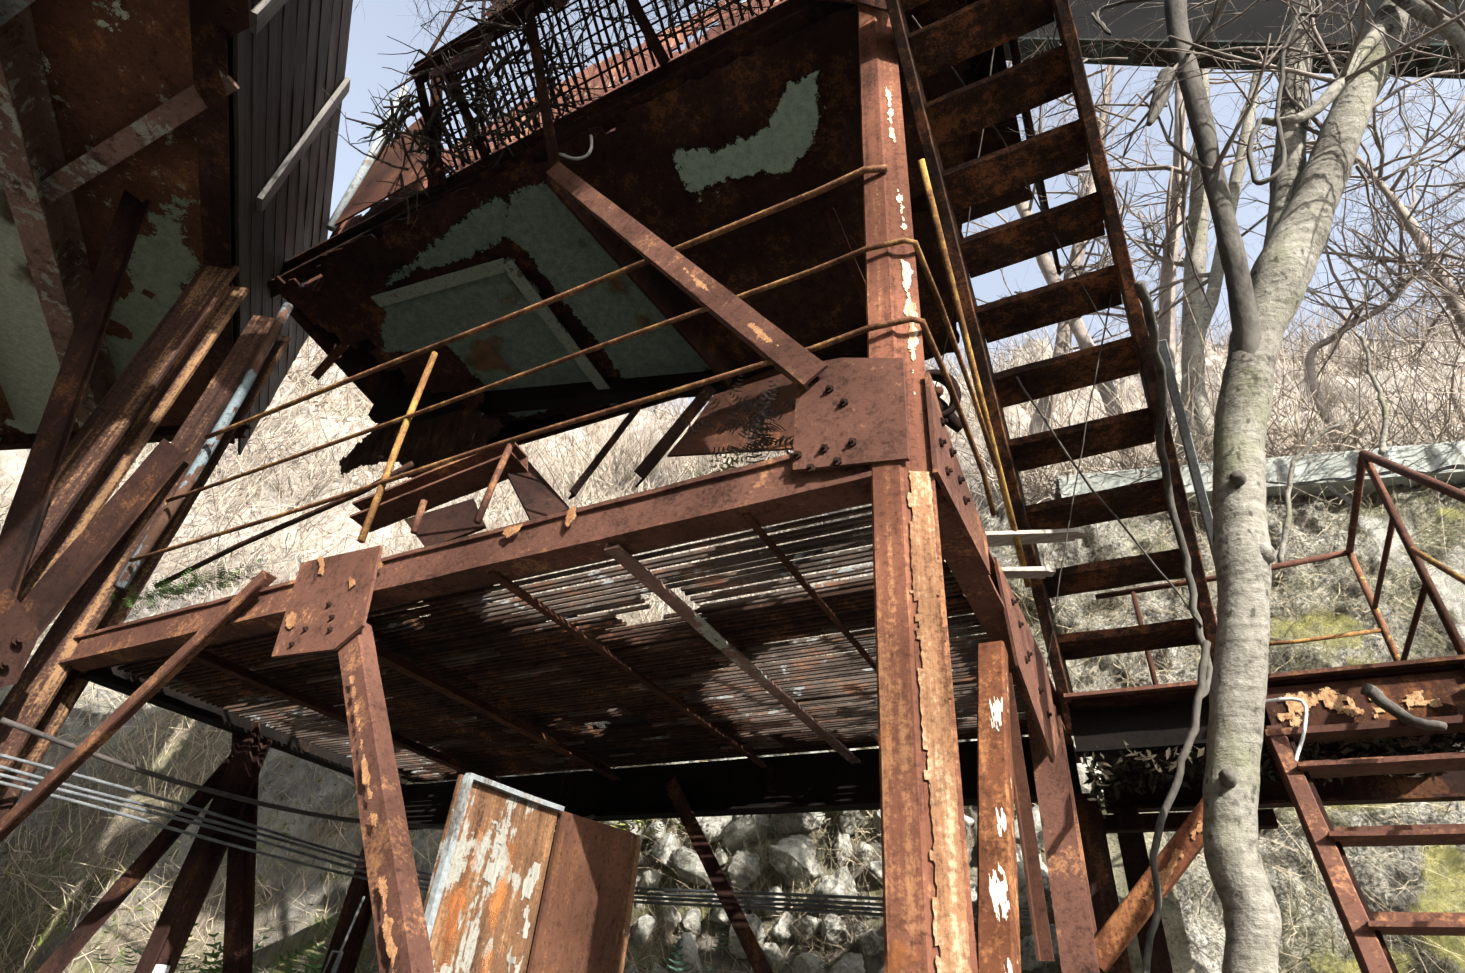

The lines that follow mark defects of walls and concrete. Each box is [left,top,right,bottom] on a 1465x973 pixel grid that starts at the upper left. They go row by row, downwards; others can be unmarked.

peeling [672,70,826,202]
peeling [381,182,710,391]
peeling [747,323,779,346]
peeling [989,698,1003,731]
peeling [483,820,503,889]
peeling [996,807,1007,836]
peeling [506,862,541,973]
peeling [989,863,1010,922]